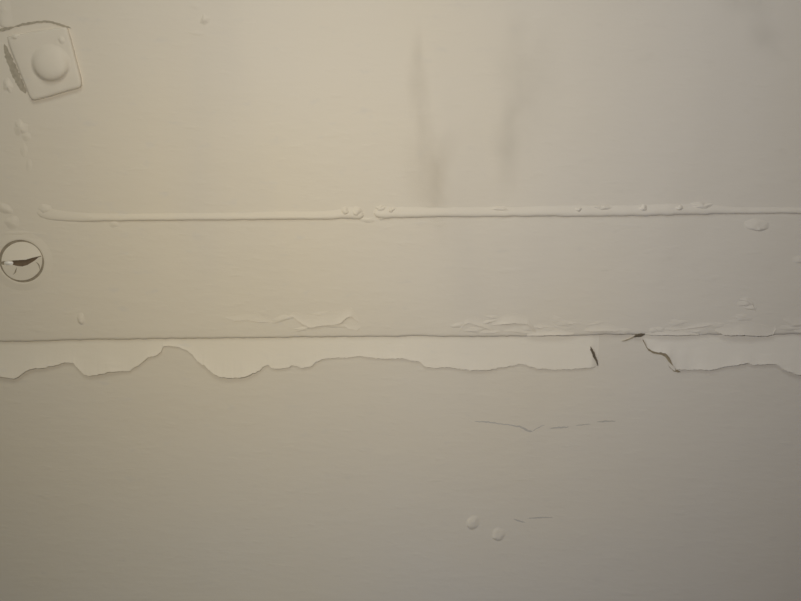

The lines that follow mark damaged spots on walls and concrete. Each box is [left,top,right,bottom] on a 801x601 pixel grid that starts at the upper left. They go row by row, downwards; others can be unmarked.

peeling [0,321,599,379]
peeling [642,334,801,375]